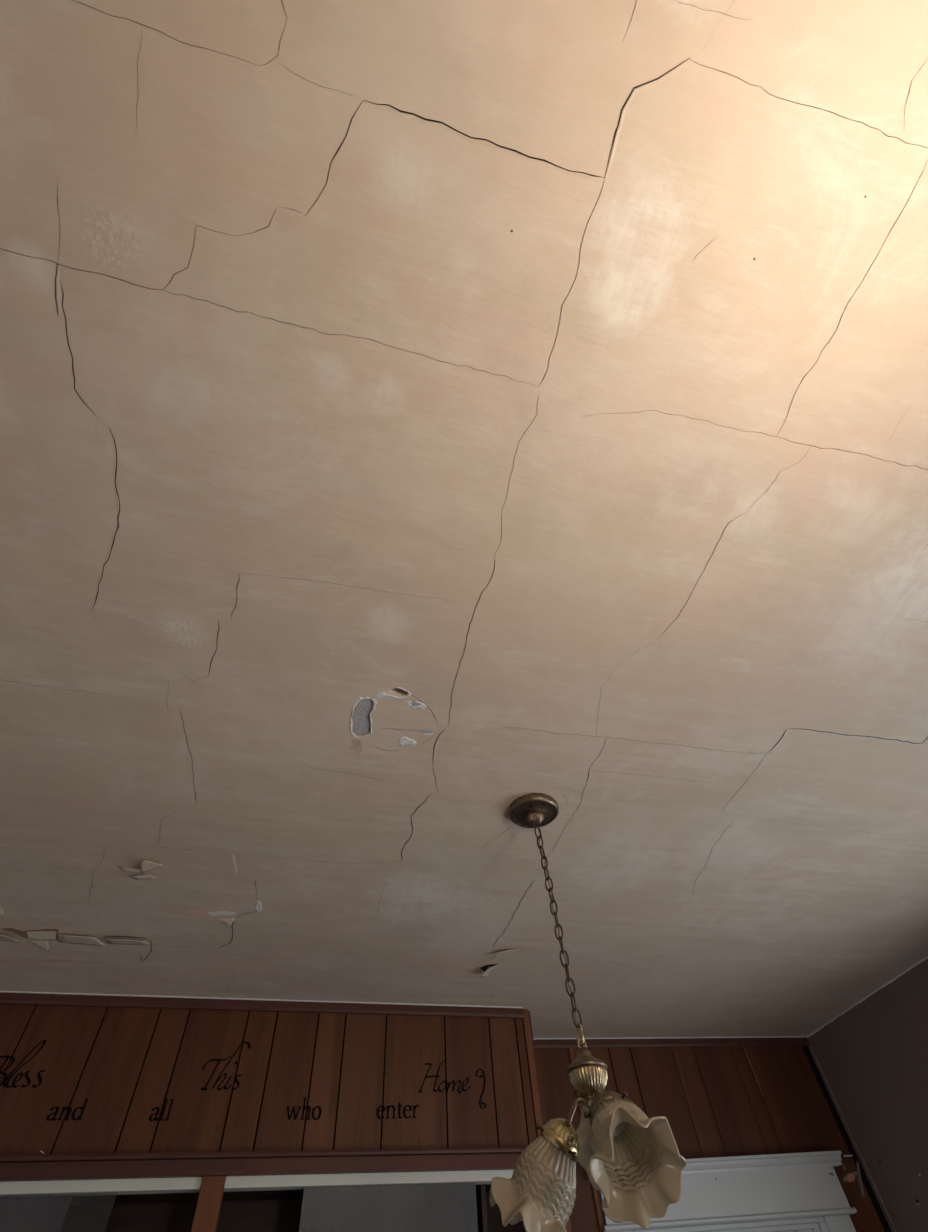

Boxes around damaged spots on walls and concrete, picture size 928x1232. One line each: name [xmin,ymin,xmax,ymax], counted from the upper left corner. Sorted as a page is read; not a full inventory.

crack [2,0,928,964]
spalling [349,687,438,753]
peeling [0,928,149,952]
peeling [480,949,523,978]